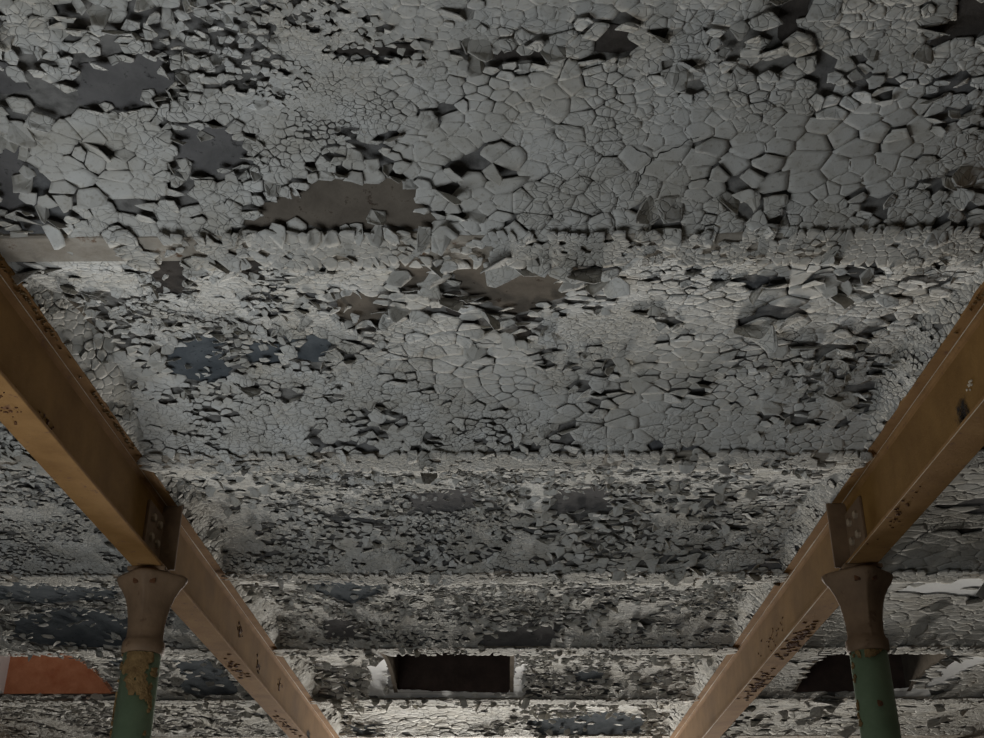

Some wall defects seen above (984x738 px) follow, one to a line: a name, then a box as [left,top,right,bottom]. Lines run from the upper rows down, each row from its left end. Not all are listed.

peeling [0,0,984,256]
crack [109,223,984,274]
crack [627,137,699,200]
peeling [0,250,984,738]